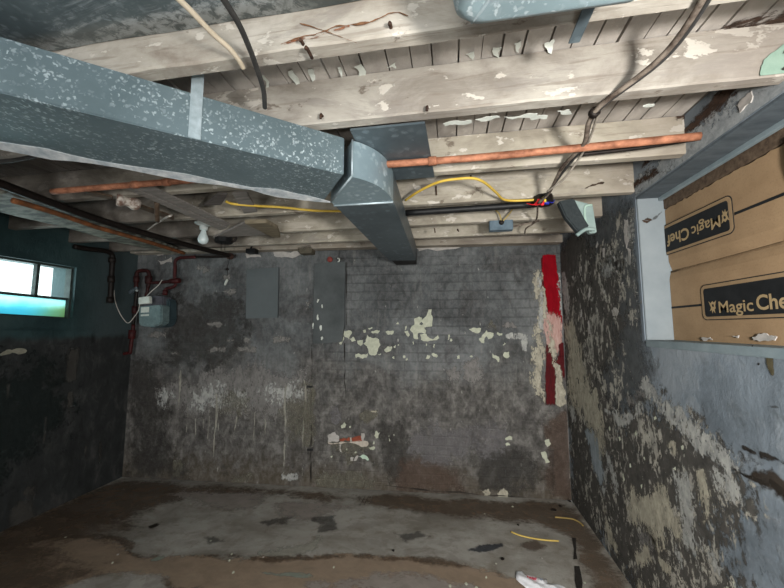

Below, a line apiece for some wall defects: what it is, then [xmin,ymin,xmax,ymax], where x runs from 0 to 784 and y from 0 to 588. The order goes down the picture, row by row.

peeling [443,113,548,126]
peeling [594,207,636,279]
peeling [339,309,452,360]
peeling [469,319,517,362]
peeling [751,333,777,347]
water stain [0,202,768,588]
spalling [328,422,379,465]